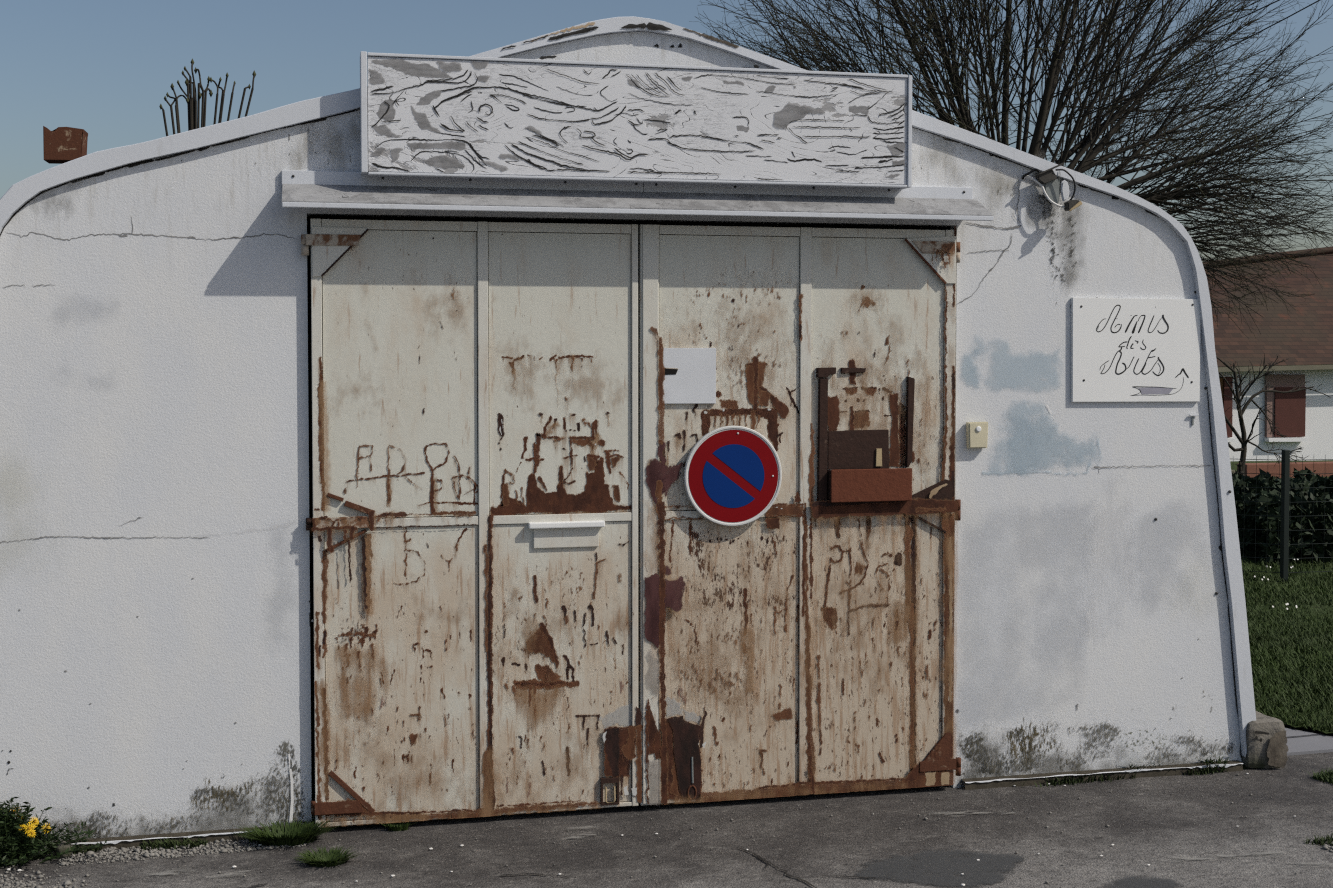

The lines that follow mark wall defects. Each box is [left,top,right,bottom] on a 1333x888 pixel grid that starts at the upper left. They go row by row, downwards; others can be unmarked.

crack [0,109,360,241]
damp [1038,195,1079,284]
crack [0,517,211,543]
rust [312,354,643,826]
rust [661,283,959,803]
damp [48,742,306,840]
damp [960,719,1235,779]